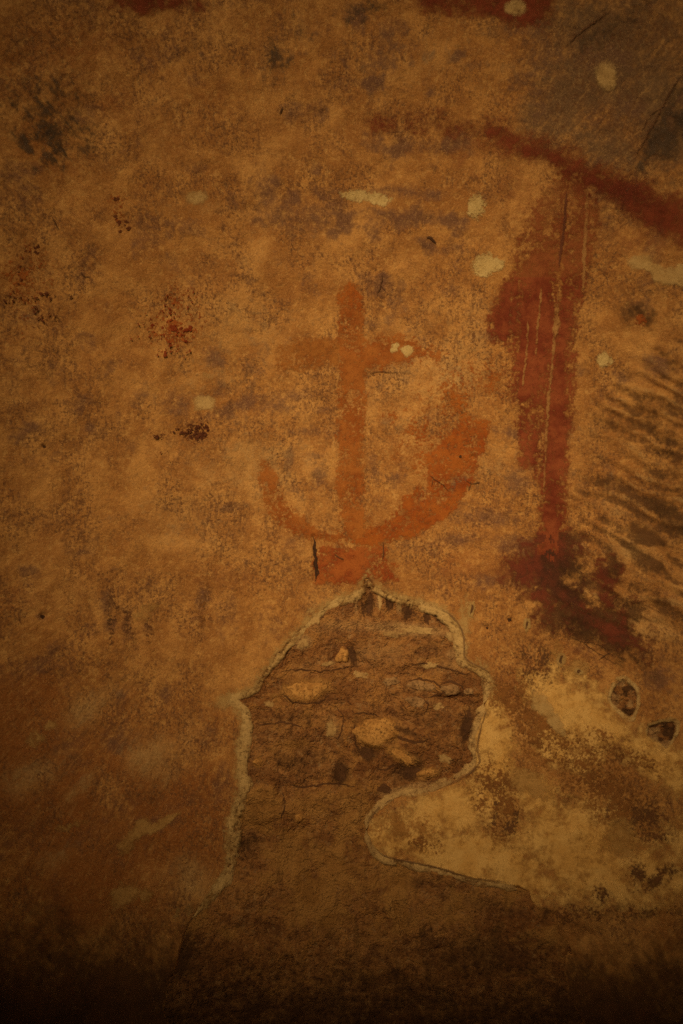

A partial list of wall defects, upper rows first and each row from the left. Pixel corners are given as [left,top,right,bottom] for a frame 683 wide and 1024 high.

damp [610,385,683,462]
crack [312,538,343,581]
damp [585,470,683,596]
spalling [165,568,683,1024]